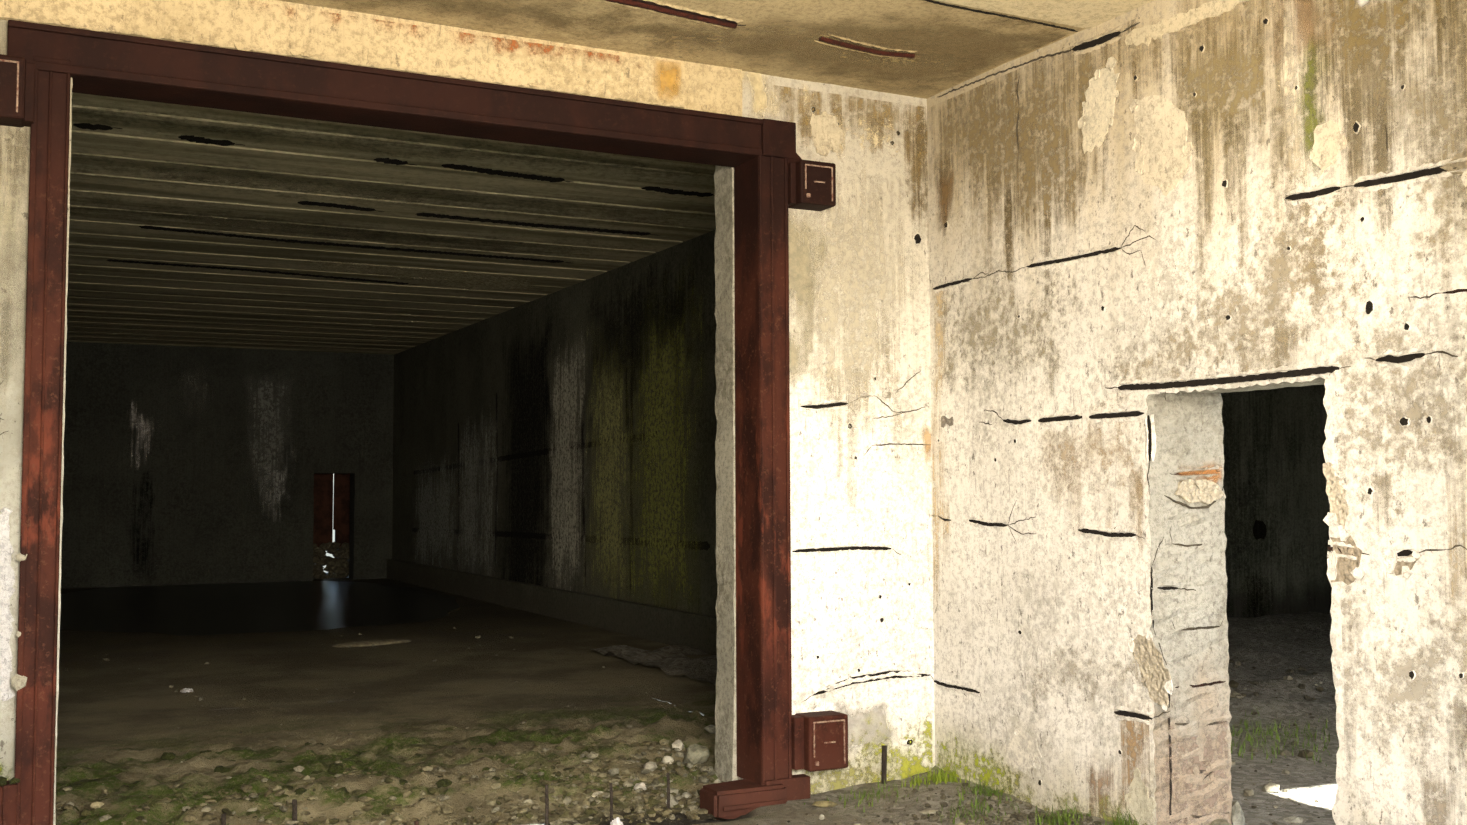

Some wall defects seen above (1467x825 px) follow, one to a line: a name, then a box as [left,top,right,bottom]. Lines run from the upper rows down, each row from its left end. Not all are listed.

water stain [630,0,1467,255]
flaking render [1078,0,1249,196]
crack [1285,125,1467,208]
crack [933,225,1156,294]
water stain [1115,201,1357,380]
crack [800,372,931,454]
spalling [1128,634,1173,711]